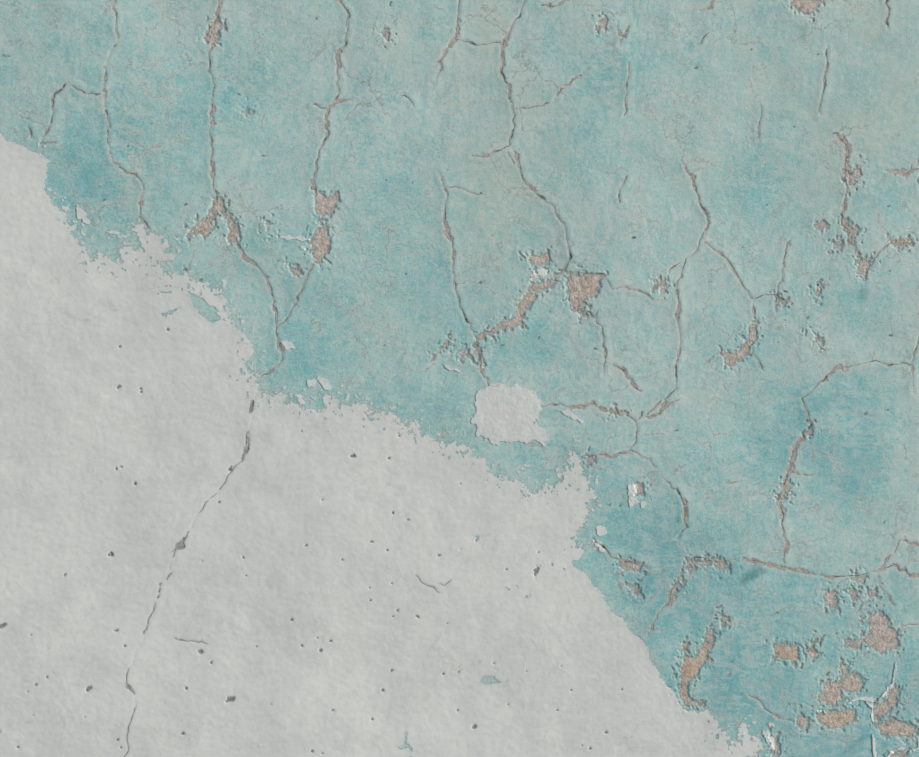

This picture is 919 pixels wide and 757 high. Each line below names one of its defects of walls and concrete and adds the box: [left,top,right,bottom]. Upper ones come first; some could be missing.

crack [29,0,149,229]
peeling [183,195,241,249]
peeling [308,188,340,265]
crack [310,0,351,195]
crack [438,0,652,299]
peeling [438,246,608,366]
crack [541,165,791,538]
crack [651,340,919,632]
crack [144,531,189,634]
peeling [672,608,730,709]
peeling [772,638,822,667]
peeling [796,612,919,757]